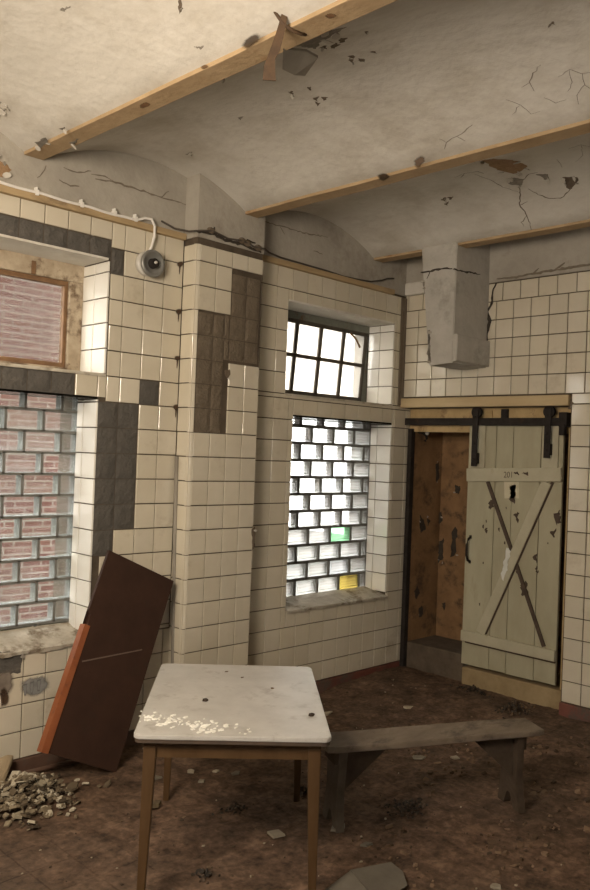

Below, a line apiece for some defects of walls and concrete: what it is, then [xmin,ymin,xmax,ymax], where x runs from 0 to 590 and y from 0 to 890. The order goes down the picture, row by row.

peeling [282,27,347,76]
crack [508,66,590,115]
flaking render [0,155,12,178]
crack [457,171,572,228]
flaking render [480,159,550,188]
flaking render [561,176,578,189]
crack [421,267,497,341]